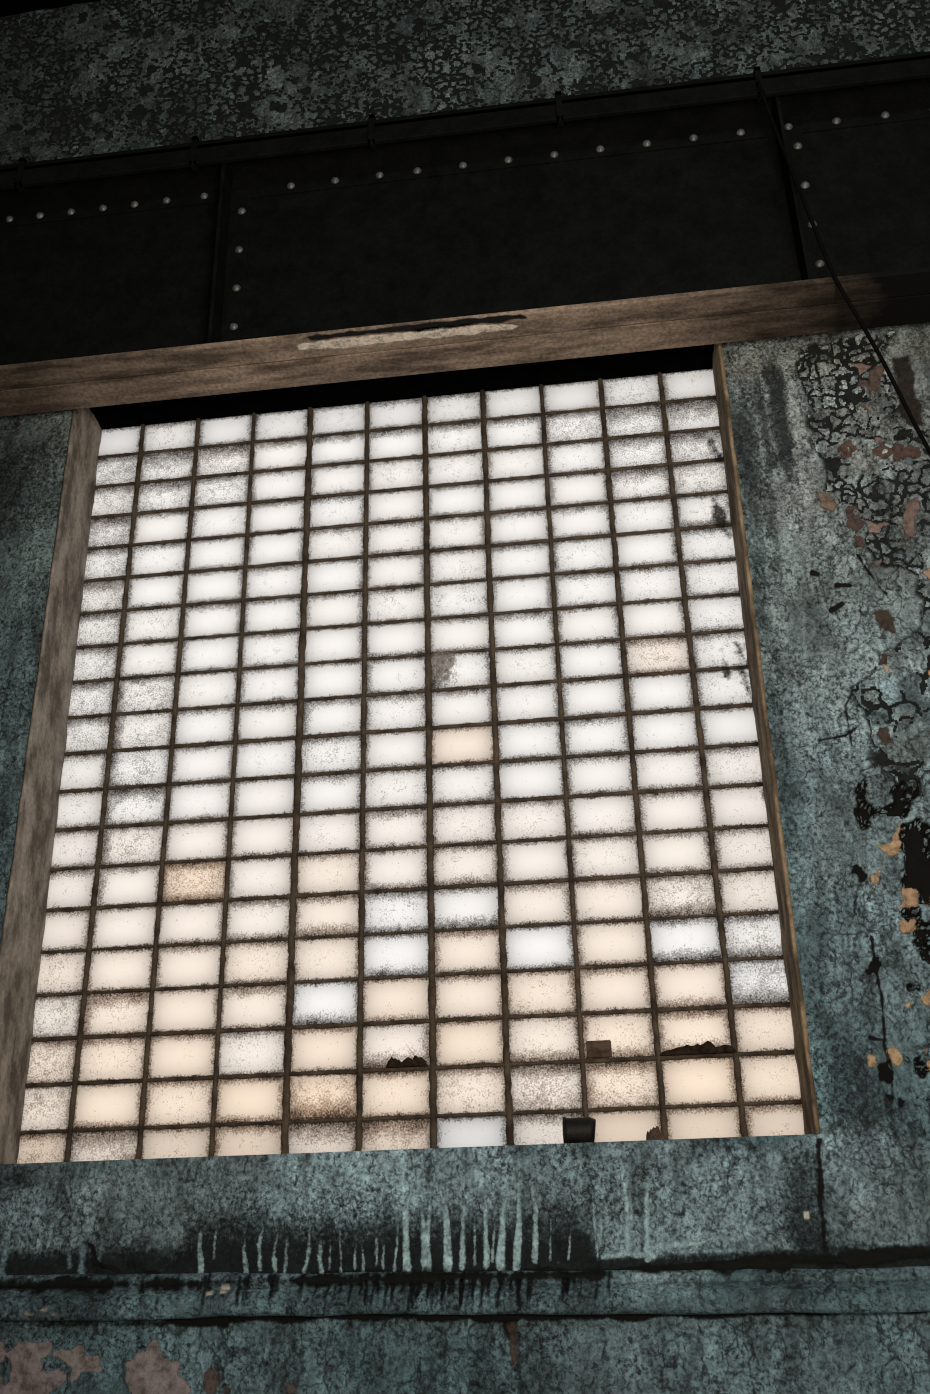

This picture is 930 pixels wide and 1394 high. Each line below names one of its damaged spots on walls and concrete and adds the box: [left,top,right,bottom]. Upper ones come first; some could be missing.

peeling [796,331,930,964]
flaking render [863,957,882,976]
peeling [905,983,930,1008]
flaking render [867,1047,930,1107]
water stain [243,1189,551,1273]
peeling [0,1336,230,1394]